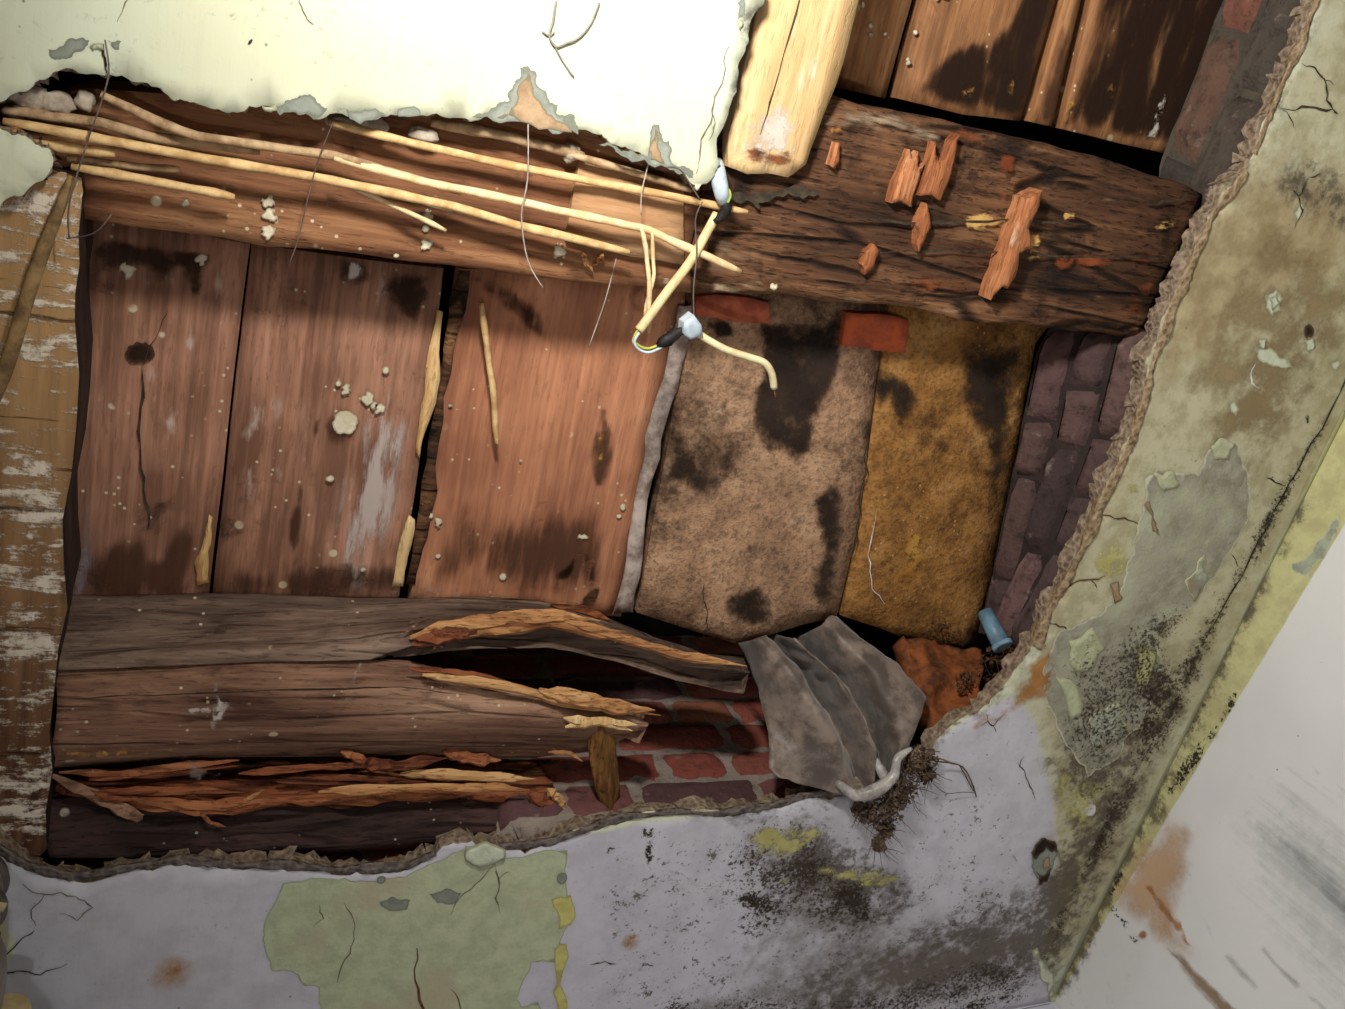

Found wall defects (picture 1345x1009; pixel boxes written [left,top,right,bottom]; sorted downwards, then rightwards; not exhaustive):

peeling [473,66,578,134]
peeling [601,124,693,177]
damp [923,0,1052,113]
damp [1043,47,1064,118]
damp [1071,0,1223,140]
crack [1281,63,1338,127]
spalling [1029,169,1251,777]
damp [608,421,1328,1009]
peeling [0,789,842,1009]
rust [1110,838,1187,943]
crack [414,948,425,1009]
rust [1173,954,1232,1009]